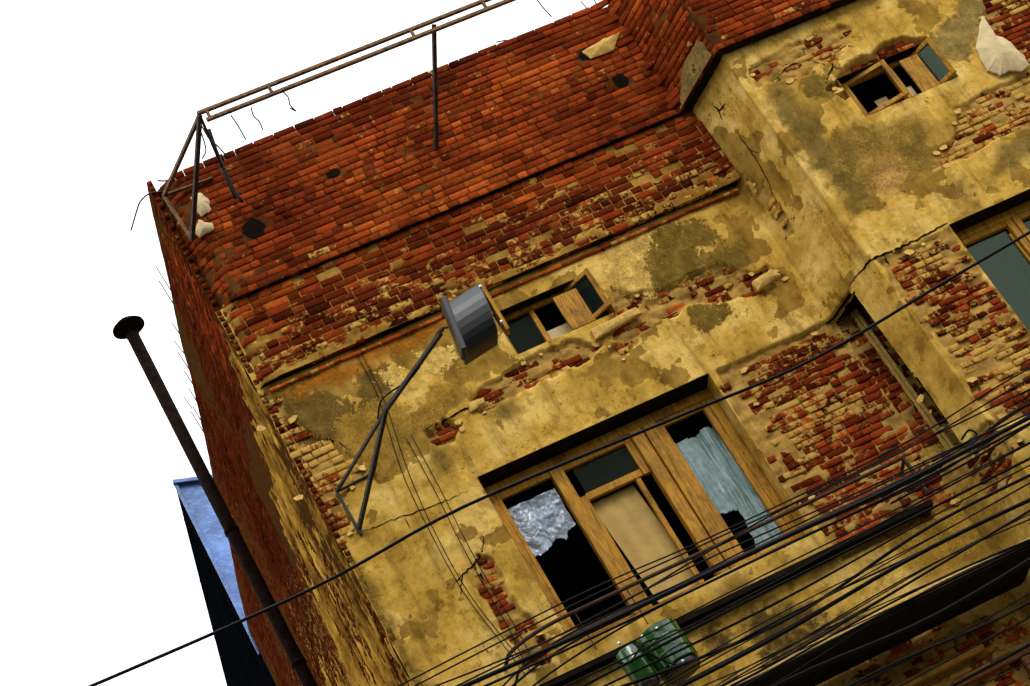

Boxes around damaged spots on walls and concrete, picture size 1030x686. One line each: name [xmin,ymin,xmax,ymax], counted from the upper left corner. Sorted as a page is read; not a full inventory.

spalling [851,41,918,72]
spalling [931,0,1030,172]
crack [713,104,776,199]
damp [770,73,933,214]
damp [992,133,1030,175]
crack [849,223,947,286]
spalling [891,239,1030,494]
spalling [720,312,961,543]
spalling [474,557,551,670]
spalling [829,616,1030,686]